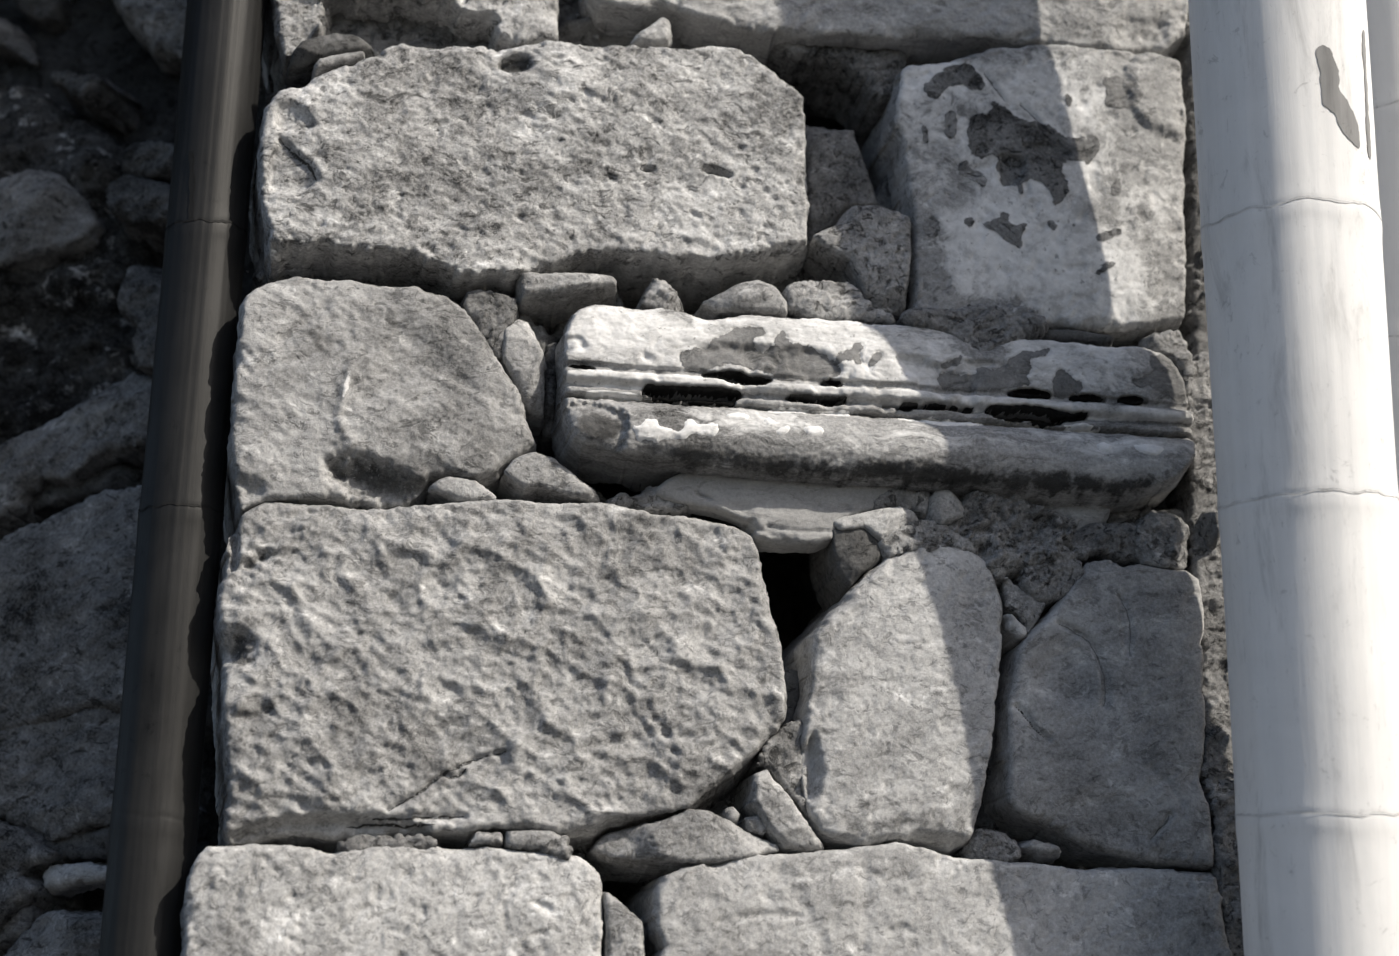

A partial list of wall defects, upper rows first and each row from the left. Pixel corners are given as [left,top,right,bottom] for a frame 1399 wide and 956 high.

peeling [1102,75,1143,108]
peeling [1316,30,1371,159]
peeling [921,63,1101,230]
peeling [1111,178,1121,195]
peeling [922,216,940,238]
peeling [964,212,1027,248]
peeling [1096,228,1122,242]
peeling [1095,261,1115,275]
peeling [632,326,882,443]
peeling [891,348,1187,452]
peeling [1134,444,1164,455]
crack [347,751,506,829]